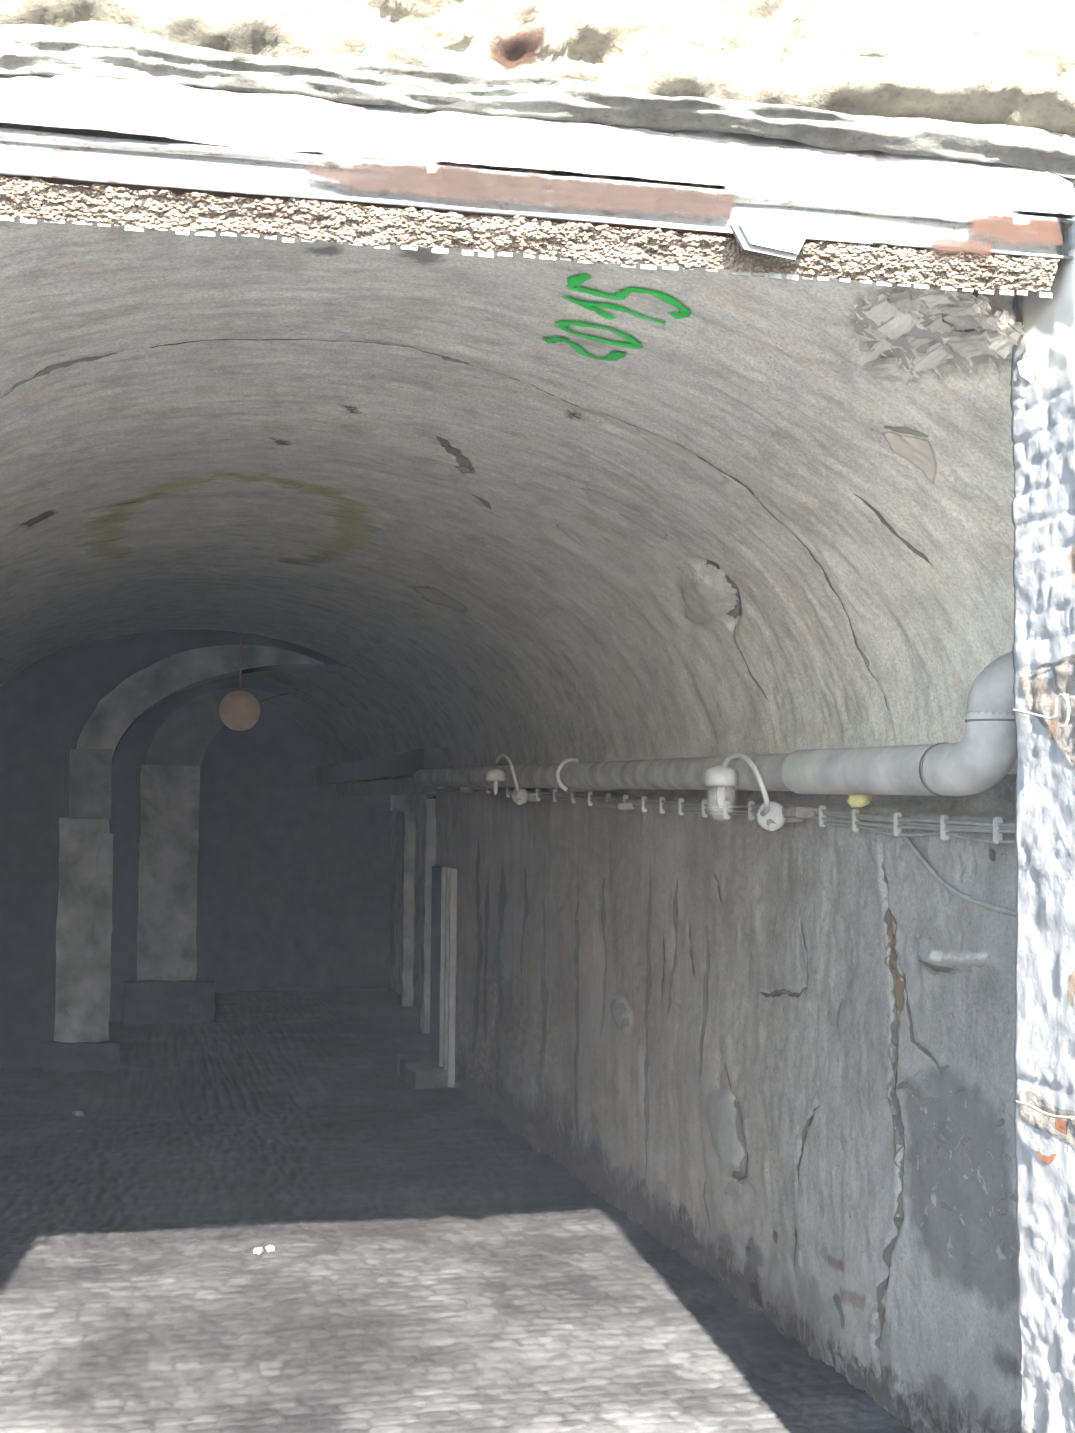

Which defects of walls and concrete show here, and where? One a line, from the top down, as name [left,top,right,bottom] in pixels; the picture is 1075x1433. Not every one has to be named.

corrosion [304,165,735,219]
corrosion [928,214,1065,256]
flaking render [849,286,1034,384]
crack [5,353,114,396]
spalling [884,426,936,482]
crack [151,339,888,708]
crack [854,494,932,565]
crack [876,860,939,1350]